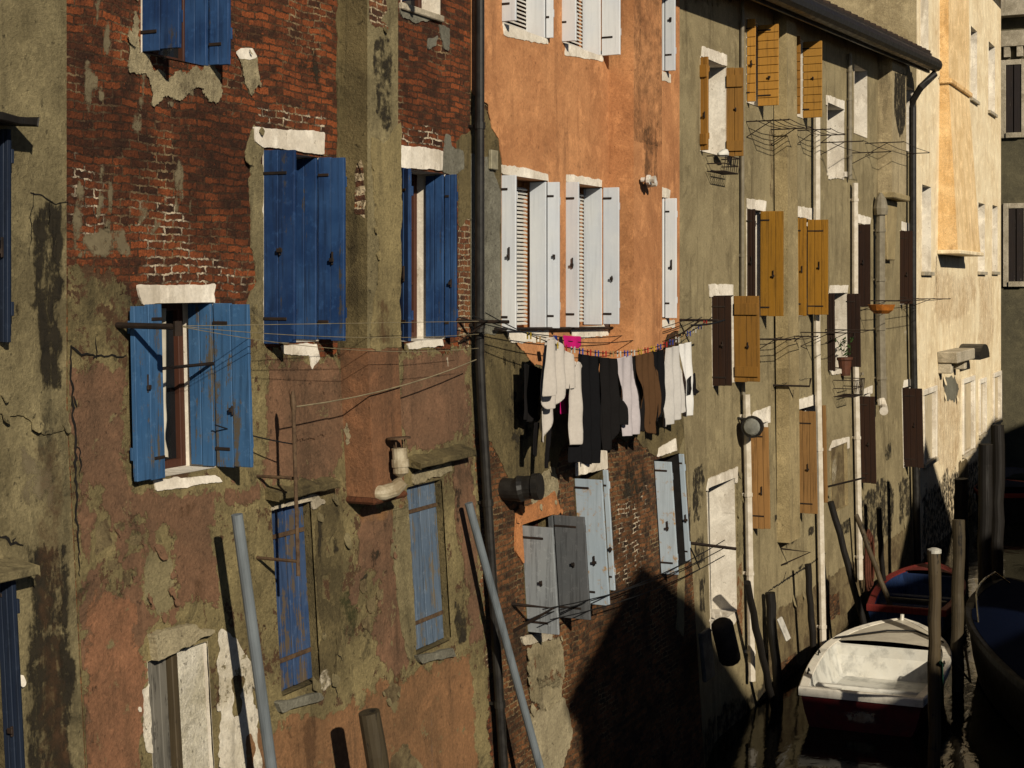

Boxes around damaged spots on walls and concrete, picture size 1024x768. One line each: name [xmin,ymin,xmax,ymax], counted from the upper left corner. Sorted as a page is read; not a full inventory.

flaking render [127,0,223,107]
flaking render [236,48,262,96]
damp [373,37,396,131]
flaking render [369,0,450,51]
flaking render [245,125,265,177]
flaking render [354,122,402,351]
damp [16,202,64,389]
crack [70,339,127,576]
flaking render [514,467,563,563]
damp [26,543,76,768]
peeling [138,684,153,753]
peeling [217,629,263,768]